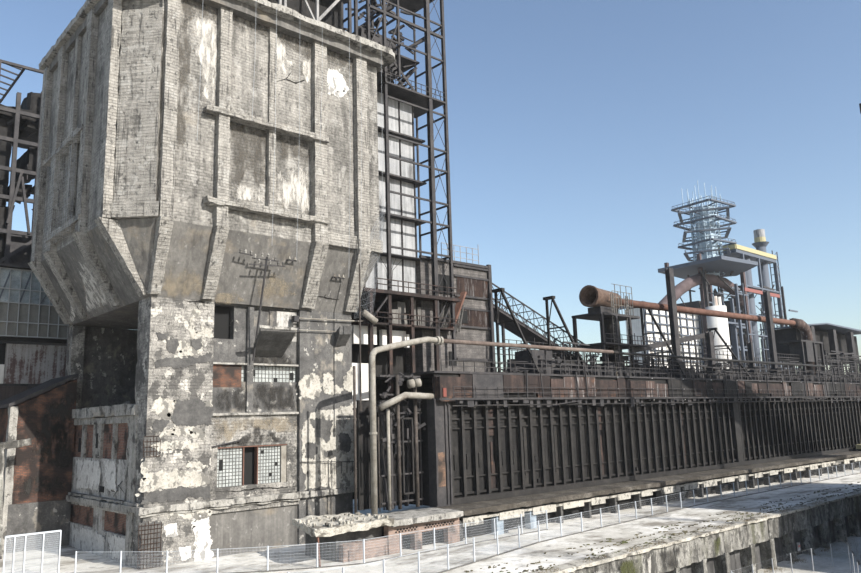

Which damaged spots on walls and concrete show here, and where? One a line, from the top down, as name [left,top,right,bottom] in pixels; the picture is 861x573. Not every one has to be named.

water stain [237,19,269,36]
water stain [176,0,218,144]
water stain [276,34,311,83]
flaking render [327,68,349,100]
water stain [230,123,267,201]
water stain [278,168,310,212]
flaking render [154,305,214,369]
flaking render [296,352,353,400]
flaking render [301,403,354,490]
flaking render [76,456,117,492]
flaking render [135,397,214,570]
water stain [662,547,680,568]